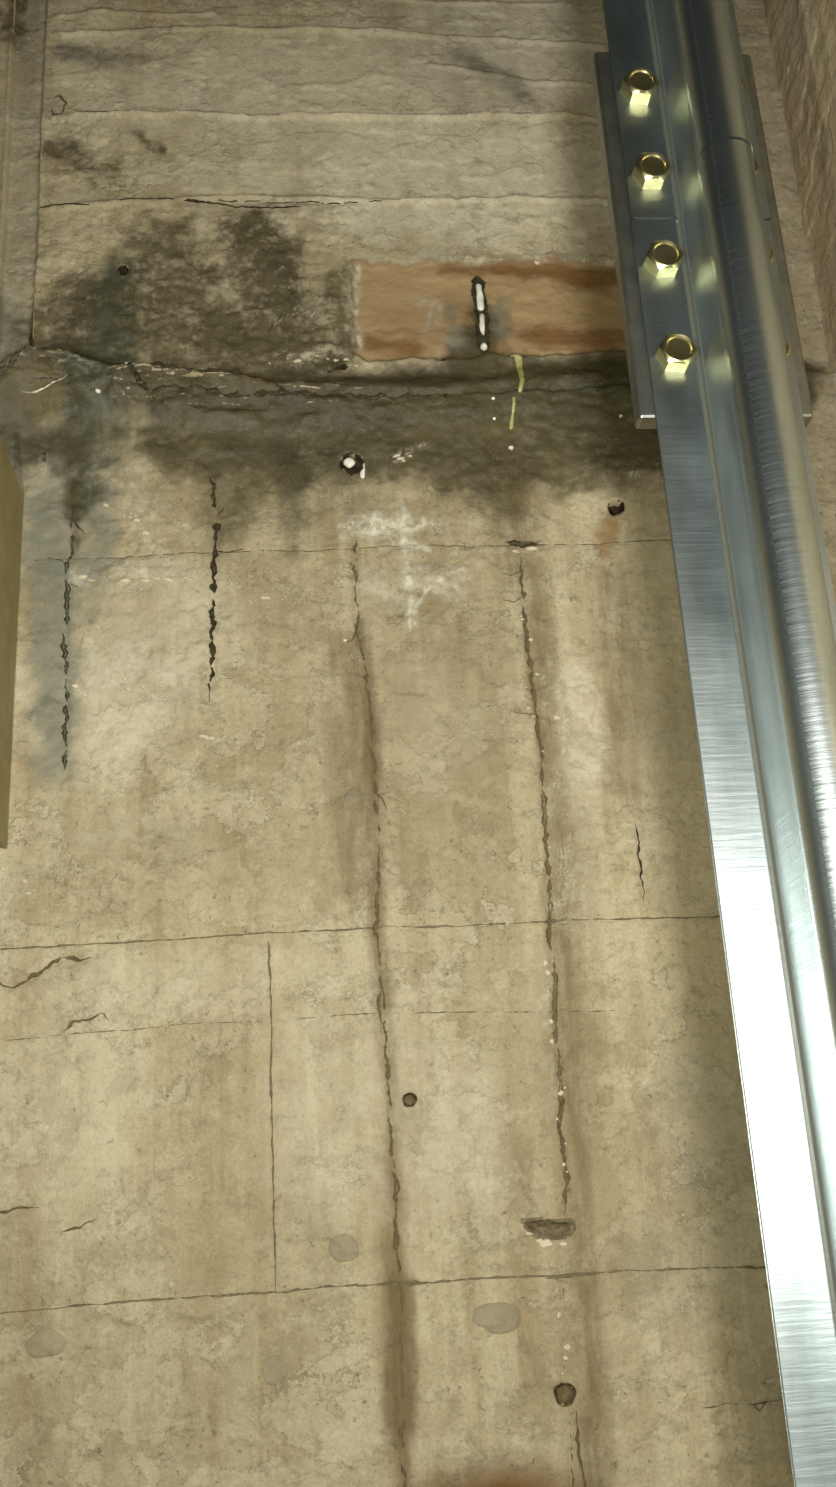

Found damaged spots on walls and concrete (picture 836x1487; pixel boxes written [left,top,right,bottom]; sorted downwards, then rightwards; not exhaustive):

leakage [14,211,352,381]
crack [0,327,34,373]
crack [74,353,630,411]
leakage [110,307,662,523]
crack [0,478,766,1487]
spalling [521,1217,576,1248]
crack [705,1399,783,1411]